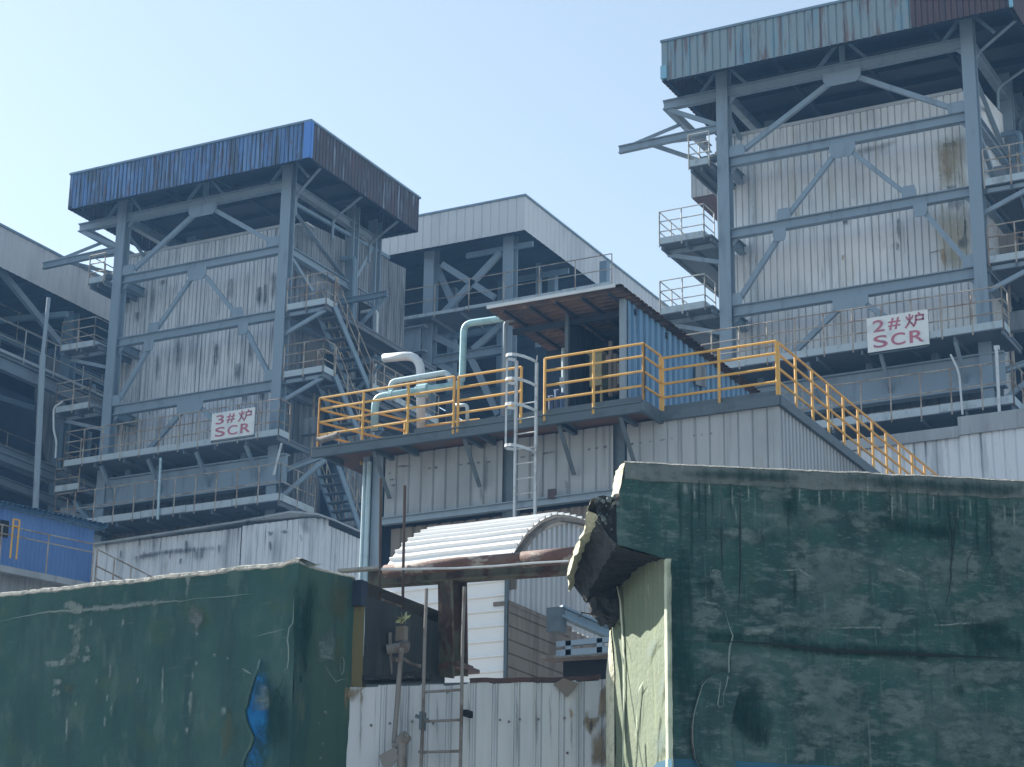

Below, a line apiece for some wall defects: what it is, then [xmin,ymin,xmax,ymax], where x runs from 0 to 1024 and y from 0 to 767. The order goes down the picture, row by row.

crack [3,594,244,621]
water stain [136,533,220,563]
spalling [574,463,625,602]
water stain [671,471,800,707]
water stain [867,478,1019,544]
crack [932,505,992,639]